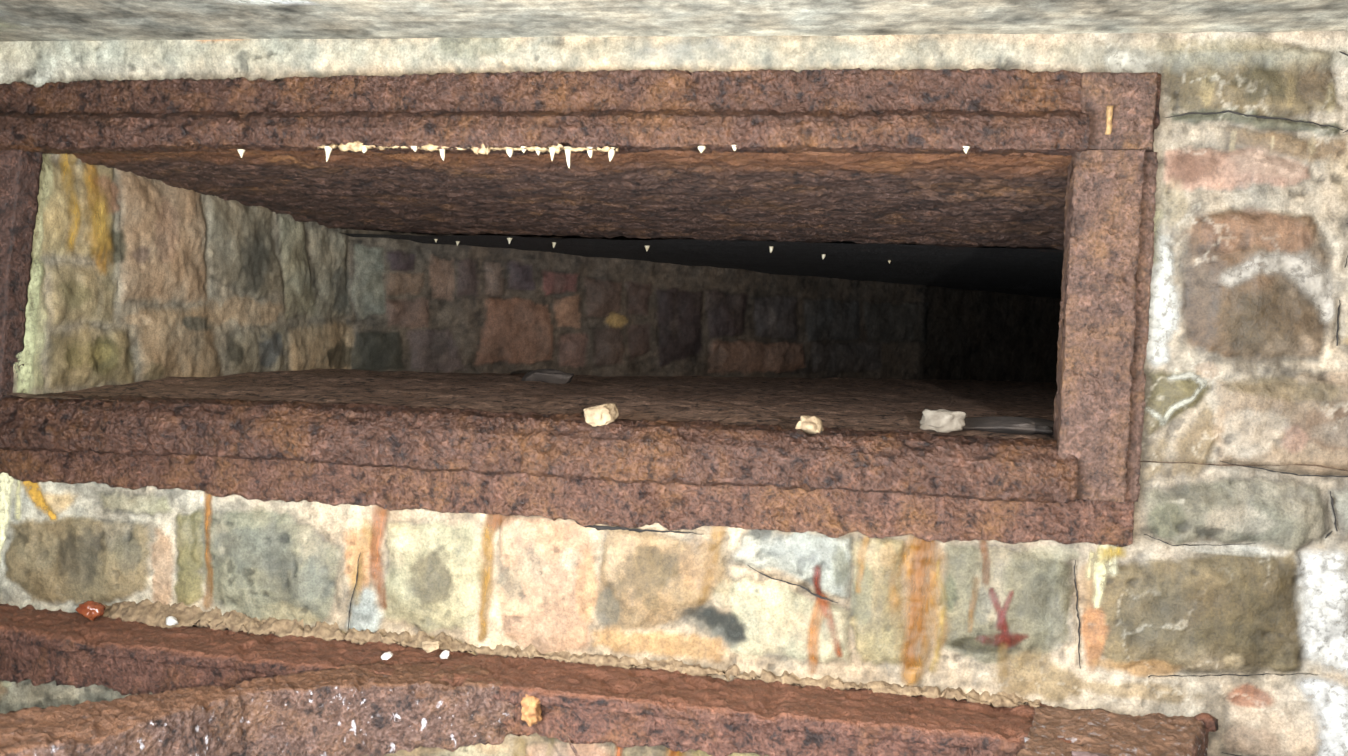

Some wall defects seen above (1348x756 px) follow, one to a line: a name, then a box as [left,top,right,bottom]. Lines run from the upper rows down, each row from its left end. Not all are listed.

corrosion [1105,106,1113,135]
crack [1166,110,1348,133]
corrosion [370,506,387,607]
corrosion [479,514,501,641]
corrosion [808,566,841,665]
corrosion [893,535,943,685]
corrosion [981,539,1026,646]
damp [1299,552,1348,756]